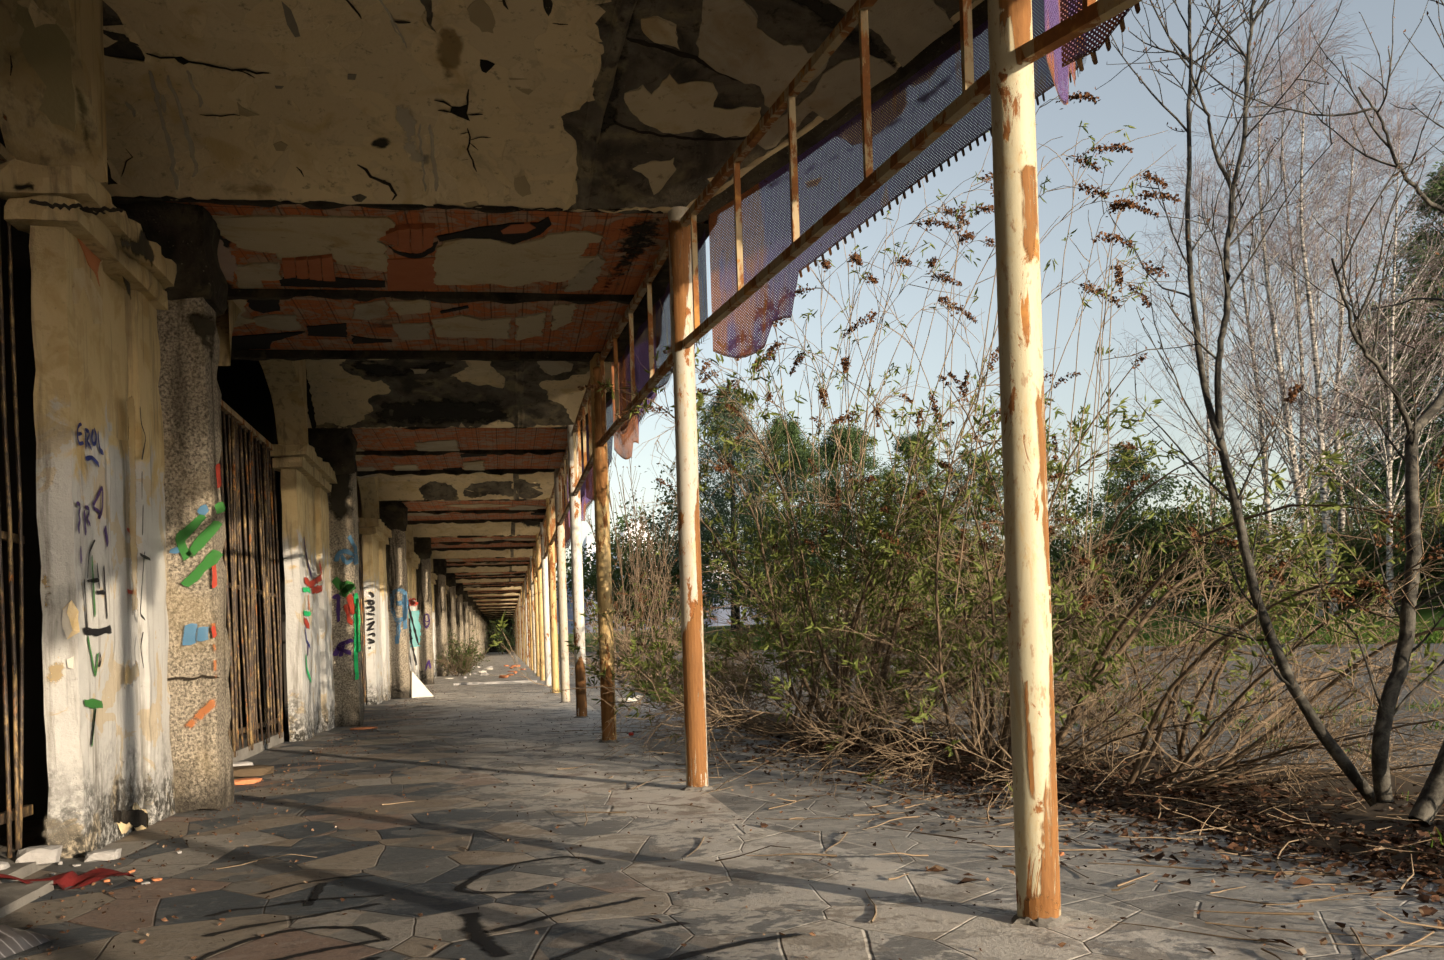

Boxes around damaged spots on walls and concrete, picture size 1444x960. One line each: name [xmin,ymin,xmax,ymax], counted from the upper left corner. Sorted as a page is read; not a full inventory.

spalling [102,0,151,64]
crack [146,53,269,78]
crack [358,165,397,200]
crack [433,128,663,214]
peeling [388,0,977,258]
rust [1021,165,1038,262]
rust [669,220,690,352]
peeling [231,323,590,428]
peeling [419,454,545,515]
rust [1036,380,1051,613]
rust [682,486,708,787]
rust [1024,655,1061,920]